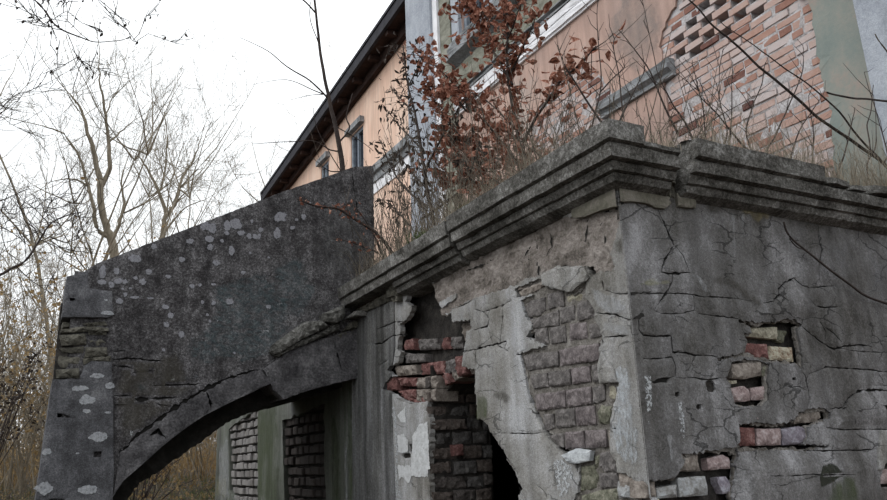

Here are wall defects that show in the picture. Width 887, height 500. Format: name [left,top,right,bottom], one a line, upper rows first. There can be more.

flaking render [661,0,835,177]
spalling [53,321,111,380]
crack [113,350,258,452]
spalling [387,323,475,423]
crack [525,234,552,275]
crack [585,202,624,244]
spalling [433,208,828,500]
crack [599,222,735,383]
crack [790,336,887,452]
peeling [397,422,430,483]